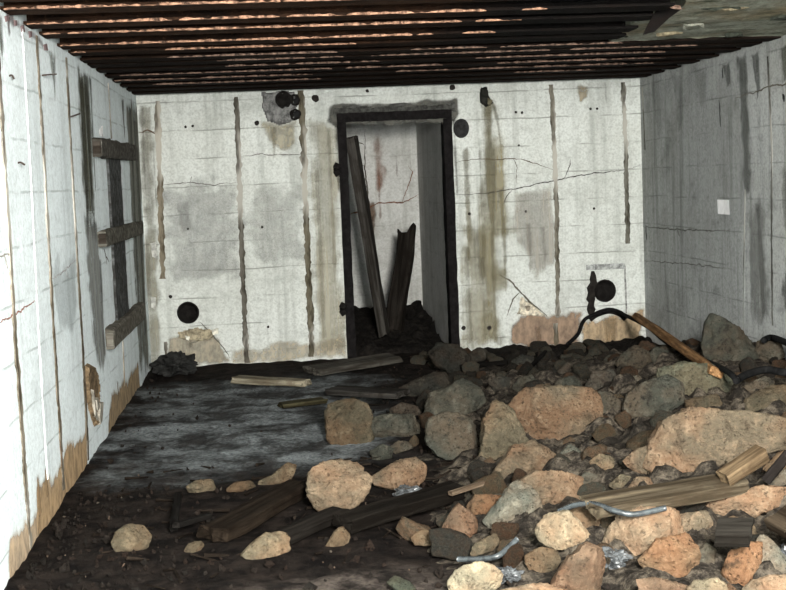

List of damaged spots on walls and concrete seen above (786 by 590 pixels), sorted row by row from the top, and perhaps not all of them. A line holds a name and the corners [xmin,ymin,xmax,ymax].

water stain [738,55,759,192]
crack [350,170,417,215]
crack [456,158,637,205]
water stain [78,72,106,369]
spalling [517,297,545,317]
spalling [178,327,218,341]
spalling [85,363,104,427]